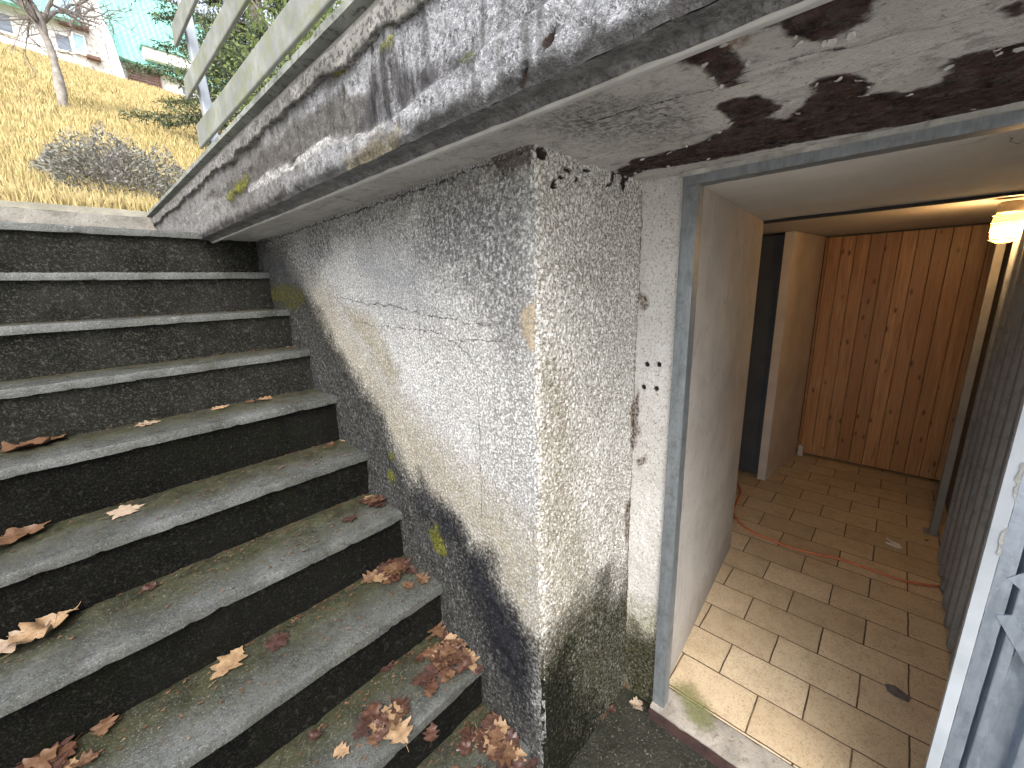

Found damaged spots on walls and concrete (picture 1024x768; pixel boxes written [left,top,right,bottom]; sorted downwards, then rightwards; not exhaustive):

peeling [764,0,874,48]
peeling [1000,1,1024,17]
peeling [617,43,1024,178]
damp [249,128,333,193]
spalling [550,168,591,189]
crack [334,297,505,517]
damp [255,172,546,768]